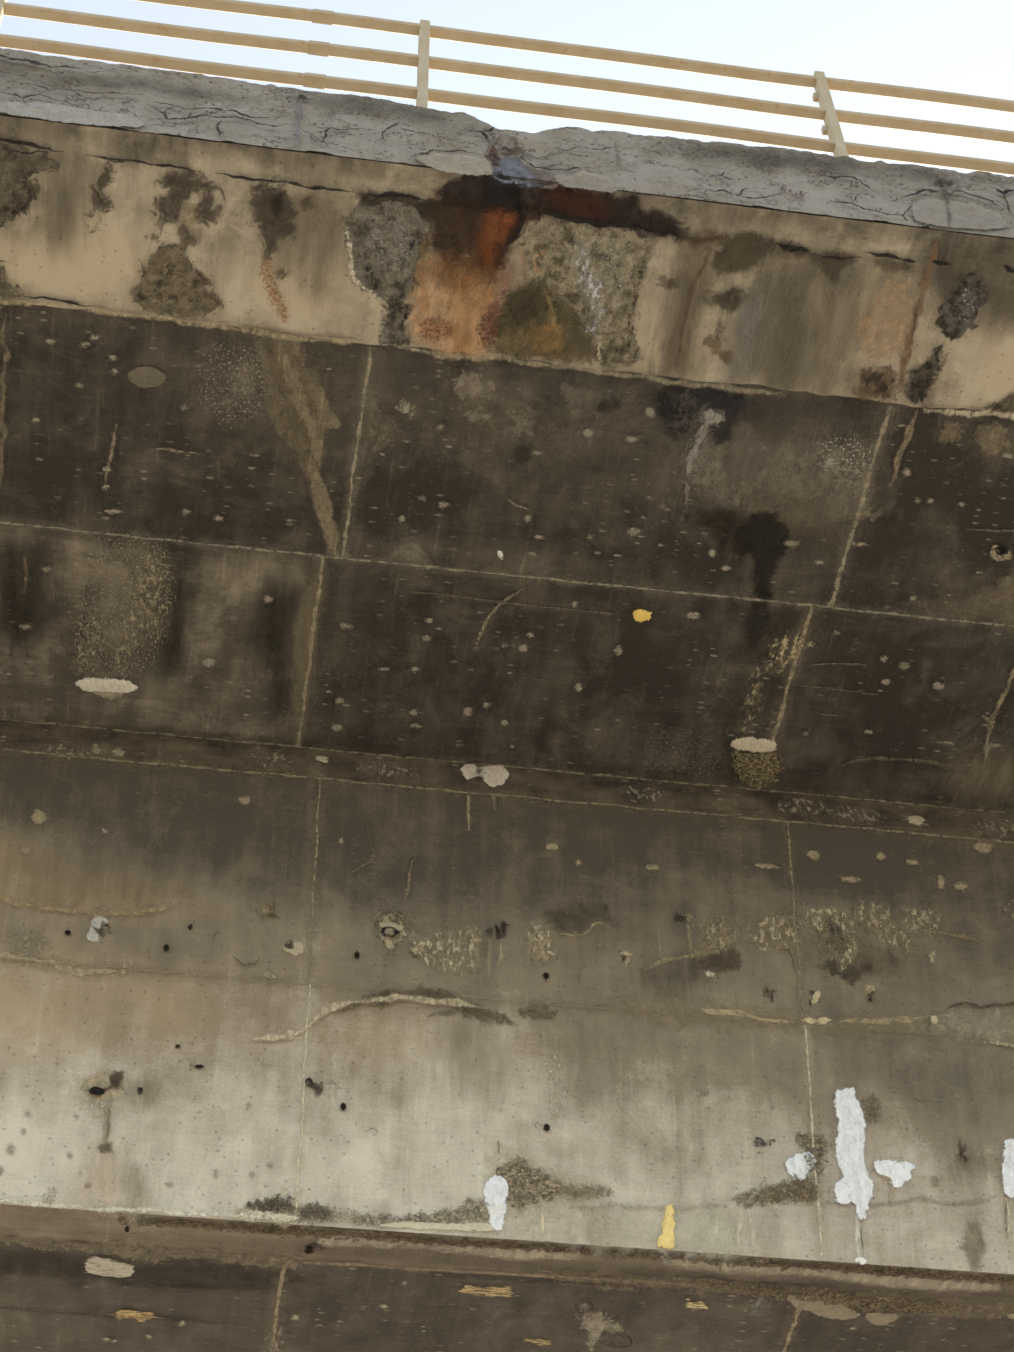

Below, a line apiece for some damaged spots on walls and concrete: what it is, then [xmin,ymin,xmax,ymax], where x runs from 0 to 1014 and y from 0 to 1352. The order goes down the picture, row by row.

spalling [0,260,21,300]
spalling [0,143,61,227]
spalling [129,170,225,321]
spalling [248,176,313,324]
spalling [342,191,434,350]
corrosion [407,173,689,359]
spalling [854,273,990,404]
damp [0,300,354,560]
damp [697,510,812,733]
spalling [232,1192,335,1251]